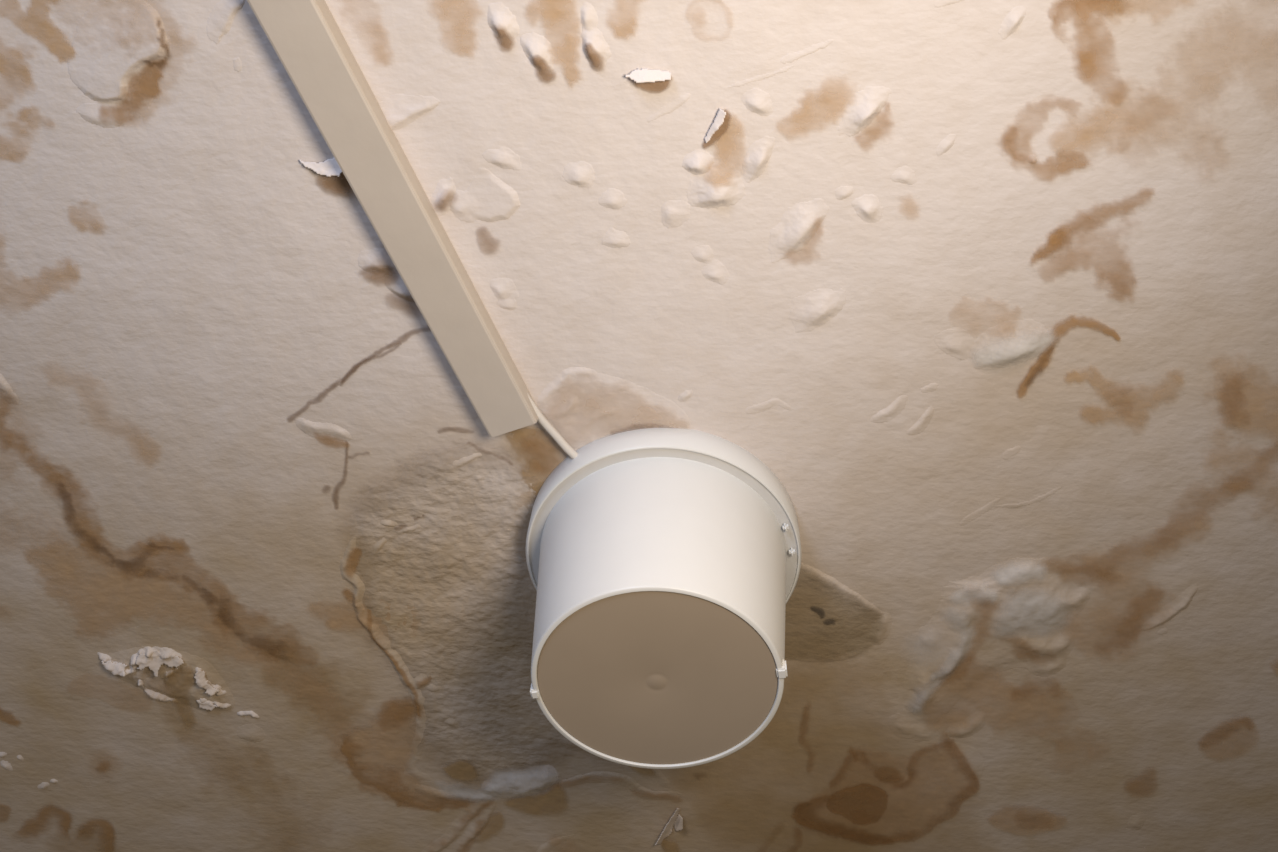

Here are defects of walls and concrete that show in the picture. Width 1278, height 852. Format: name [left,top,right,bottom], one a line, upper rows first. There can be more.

leakage [23,0,74,61]
leakage [1075,0,1122,30]
peeling [67,0,168,128]
leakage [133,69,161,106]
peeling [625,68,671,83]
leakage [1079,47,1098,79]
peeling [705,108,726,143]
peeling [299,158,342,177]
leakage [1034,227,1072,260]
leakage [39,517,295,660]
flaking render [785,572,878,657]
leakage [24,807,113,852]